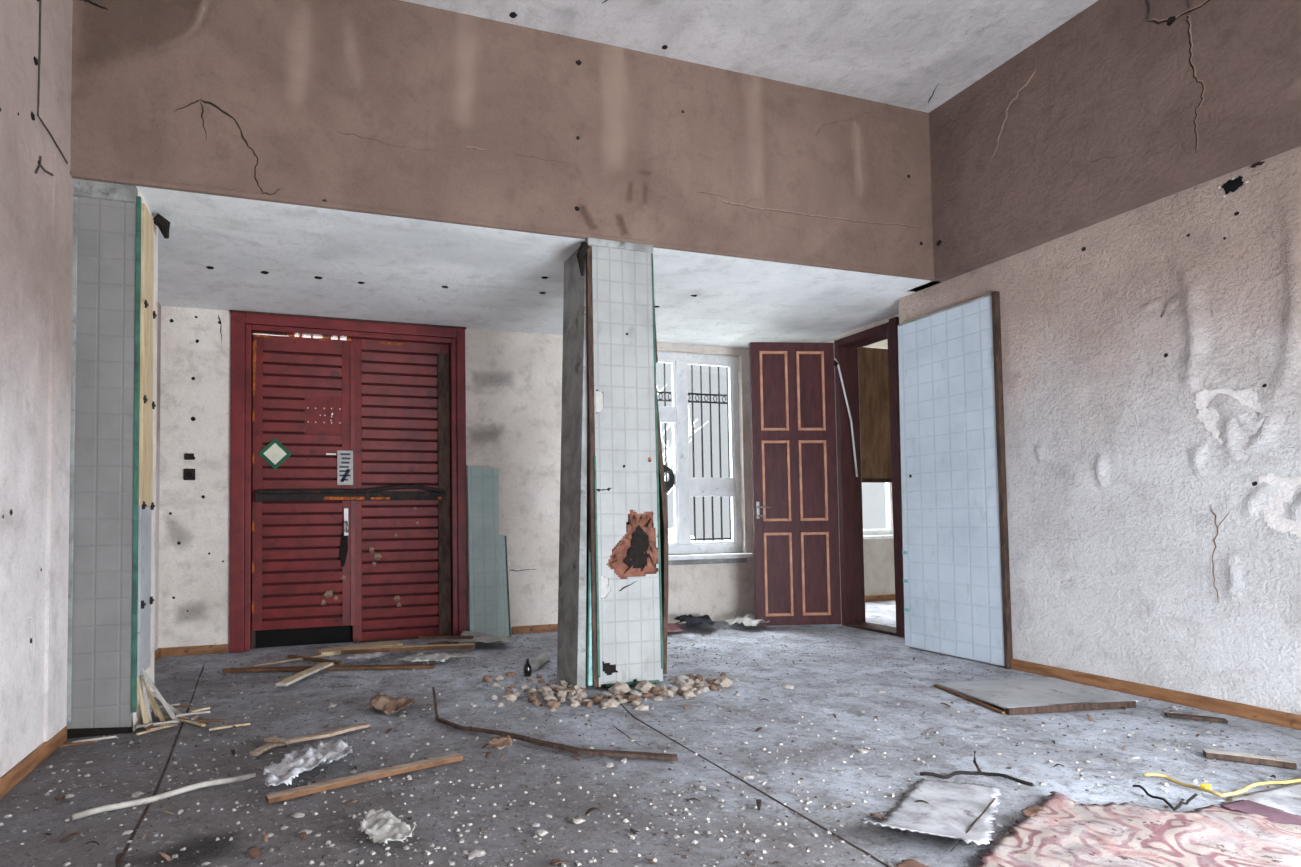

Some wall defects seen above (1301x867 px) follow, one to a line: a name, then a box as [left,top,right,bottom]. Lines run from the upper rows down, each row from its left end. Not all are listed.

crack [1148,0,1210,151]
crack [175,99,281,195]
spalling [625,525,649,568]
crack [1209,504,1229,603]